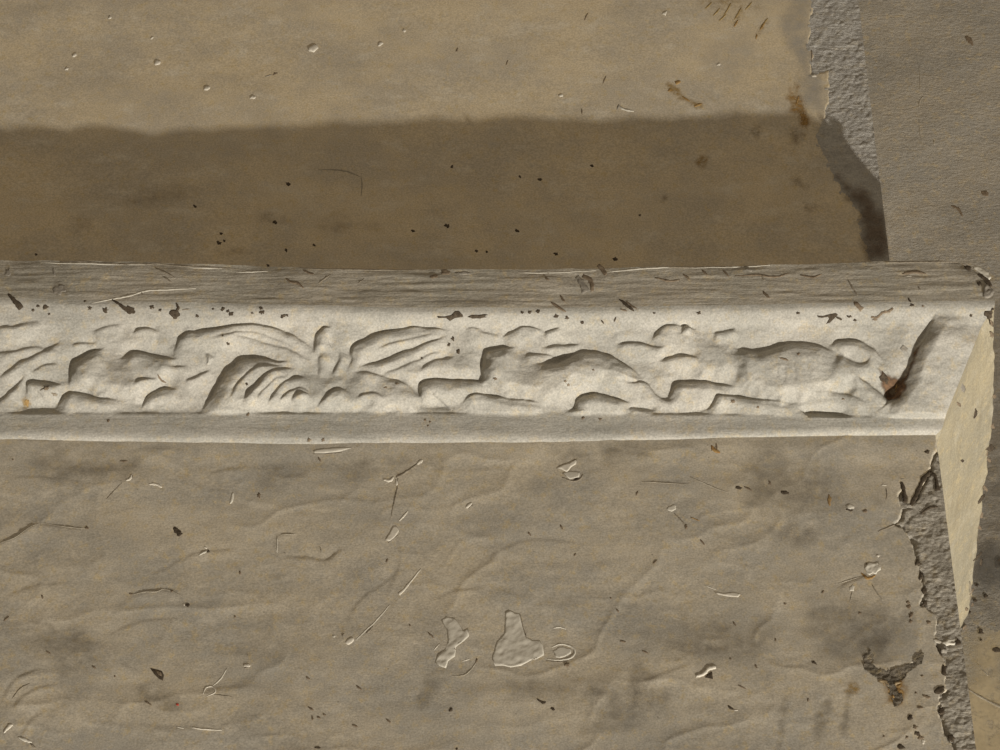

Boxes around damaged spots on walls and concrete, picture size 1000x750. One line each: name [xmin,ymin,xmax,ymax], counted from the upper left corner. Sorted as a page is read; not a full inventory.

rust [789,87,808,125]
flaking render [806,0,995,338]
spalling [40,261,266,295]
rust [879,348,919,400]
flaking render [863,450,976,750]
peeling [434,617,478,676]
peeling [492,611,576,667]